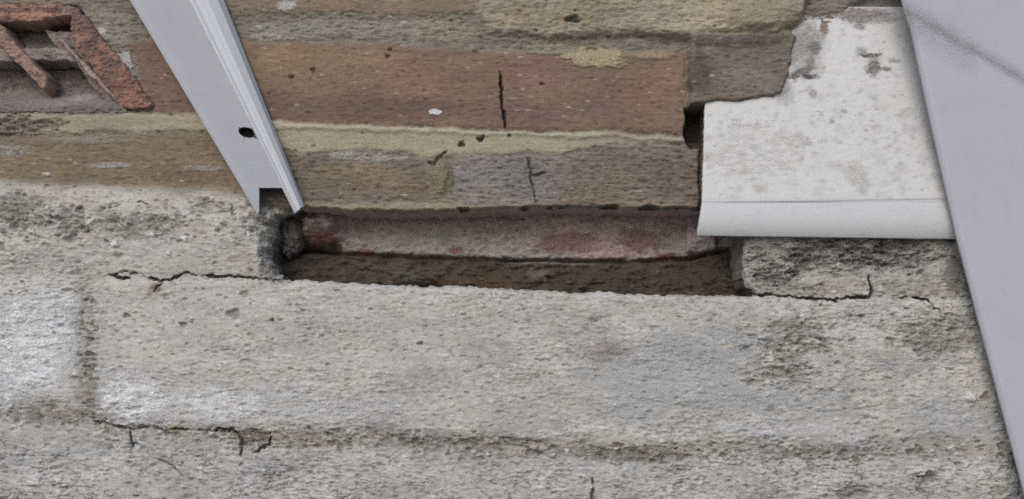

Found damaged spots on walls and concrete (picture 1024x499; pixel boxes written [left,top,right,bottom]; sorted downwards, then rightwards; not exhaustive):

crack [482,73,506,139]
spalling [254,207,942,297]
crack [109,270,282,291]
crack [747,275,873,301]
crack [95,421,271,455]